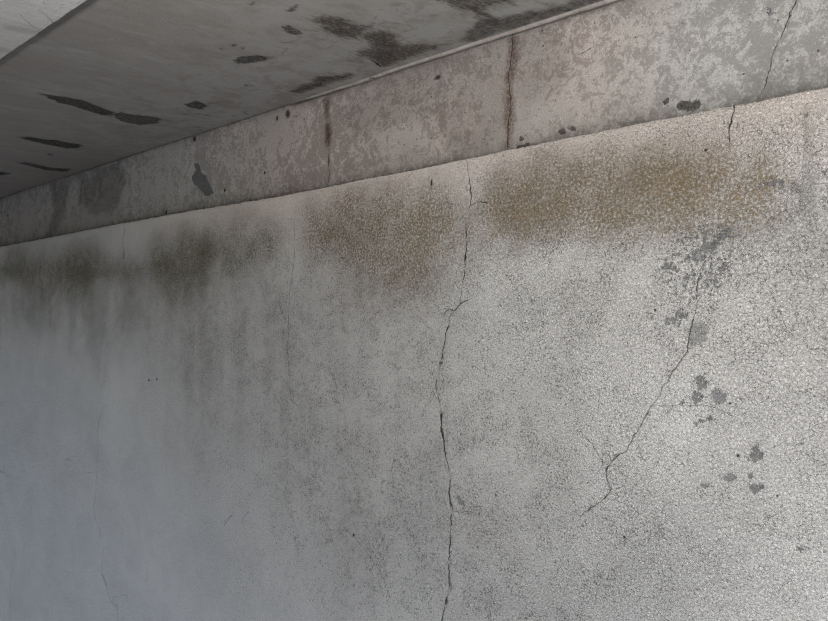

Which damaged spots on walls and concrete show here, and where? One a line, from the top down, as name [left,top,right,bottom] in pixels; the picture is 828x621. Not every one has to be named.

crack [506,34,514,150]
leakage [467,0,600,41]
crack [761,0,797,99]
spalling [192,163,214,196]
leakage [309,188,459,289]
leakage [488,157,775,239]
crack [435,158,487,621]
crack [582,261,711,515]